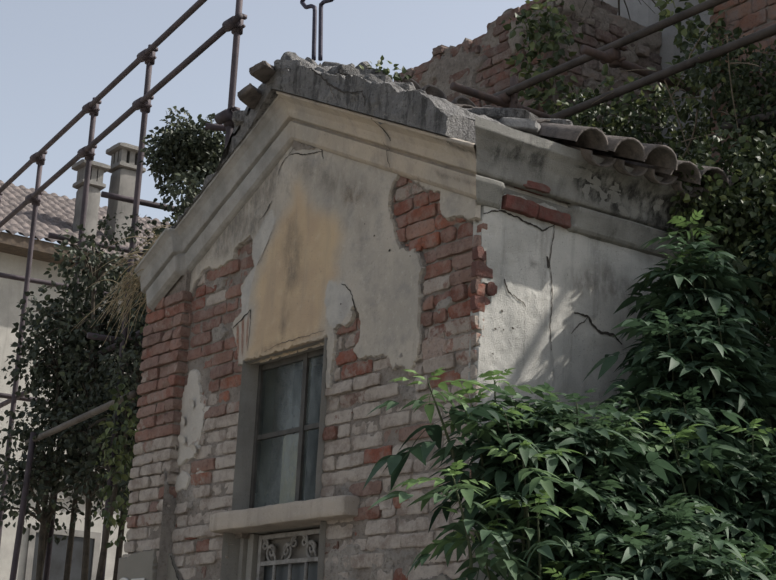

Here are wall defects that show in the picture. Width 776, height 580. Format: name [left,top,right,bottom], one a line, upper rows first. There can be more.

spalling [501,180,571,229]
spalling [122,236,254,580]
spalling [320,176,497,580]
crack [483,210,555,350]
crack [571,312,622,345]